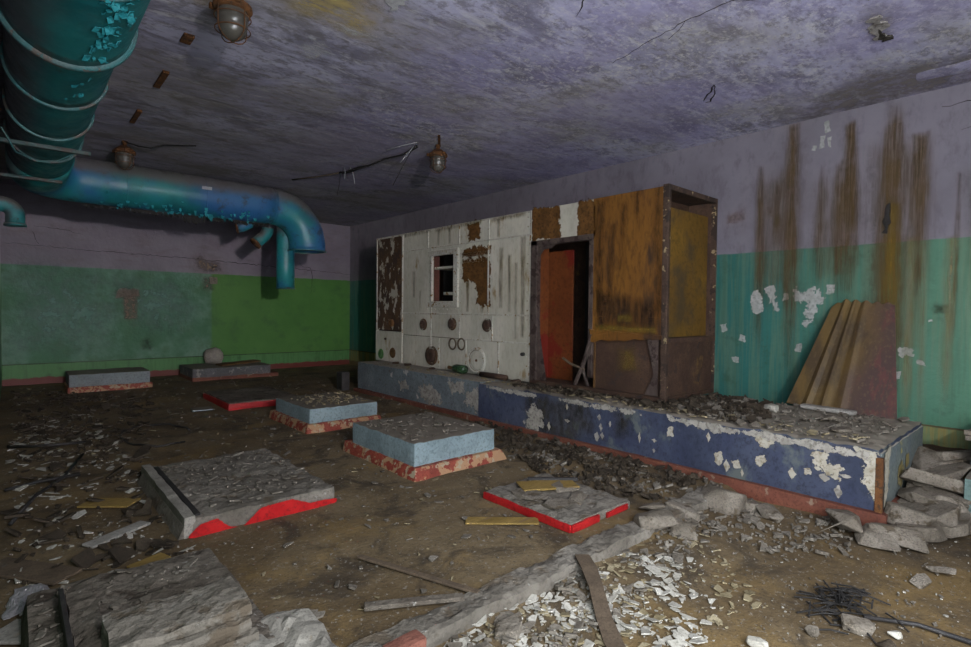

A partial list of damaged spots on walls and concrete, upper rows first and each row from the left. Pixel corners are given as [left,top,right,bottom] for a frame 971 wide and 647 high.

peeling [82,0,141,64]
spalling [866,15,894,43]
peeling [750,284,835,328]
peeling [398,379,550,431]
spalling [558,398,642,441]
spalling [667,414,909,508]